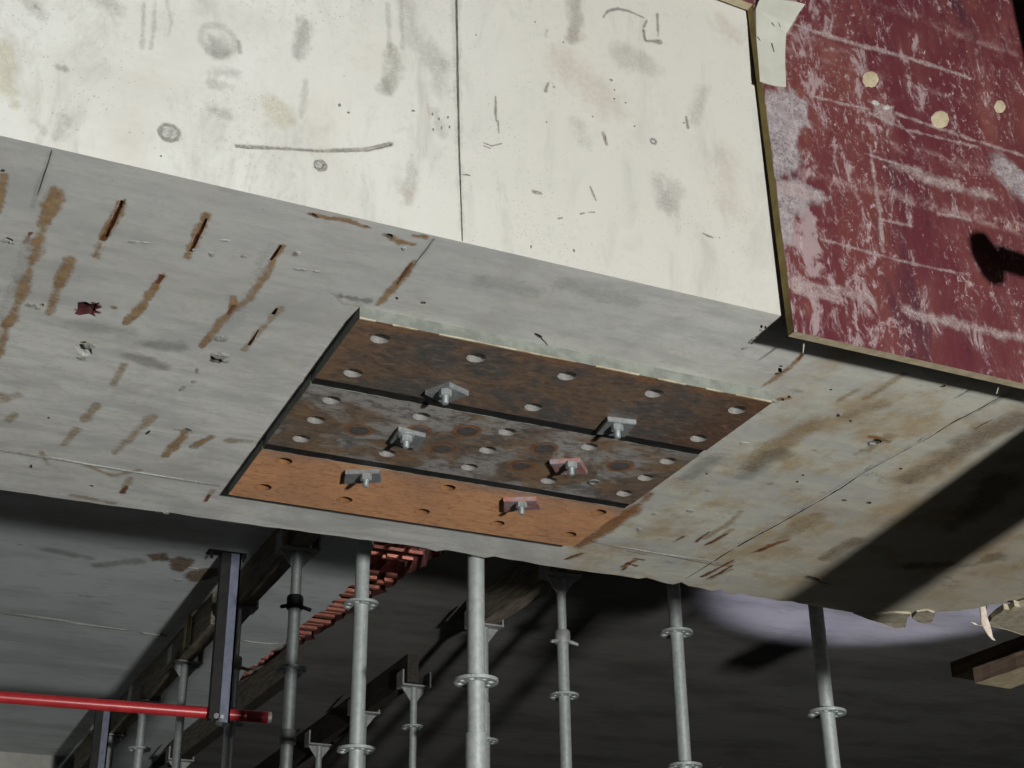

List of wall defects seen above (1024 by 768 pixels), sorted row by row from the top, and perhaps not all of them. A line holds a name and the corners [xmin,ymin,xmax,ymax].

rust [0,174,8,208]
crack [37,150,52,196]
rust [93,199,126,257]
rust [185,213,210,259]
rust [0,187,64,355]
rust [46,257,75,315]
rust [112,274,165,325]
rust [199,245,285,348]
rust [377,263,413,305]
rust [162,430,213,457]
crack [685,394,1005,579]
rust [566,493,653,559]